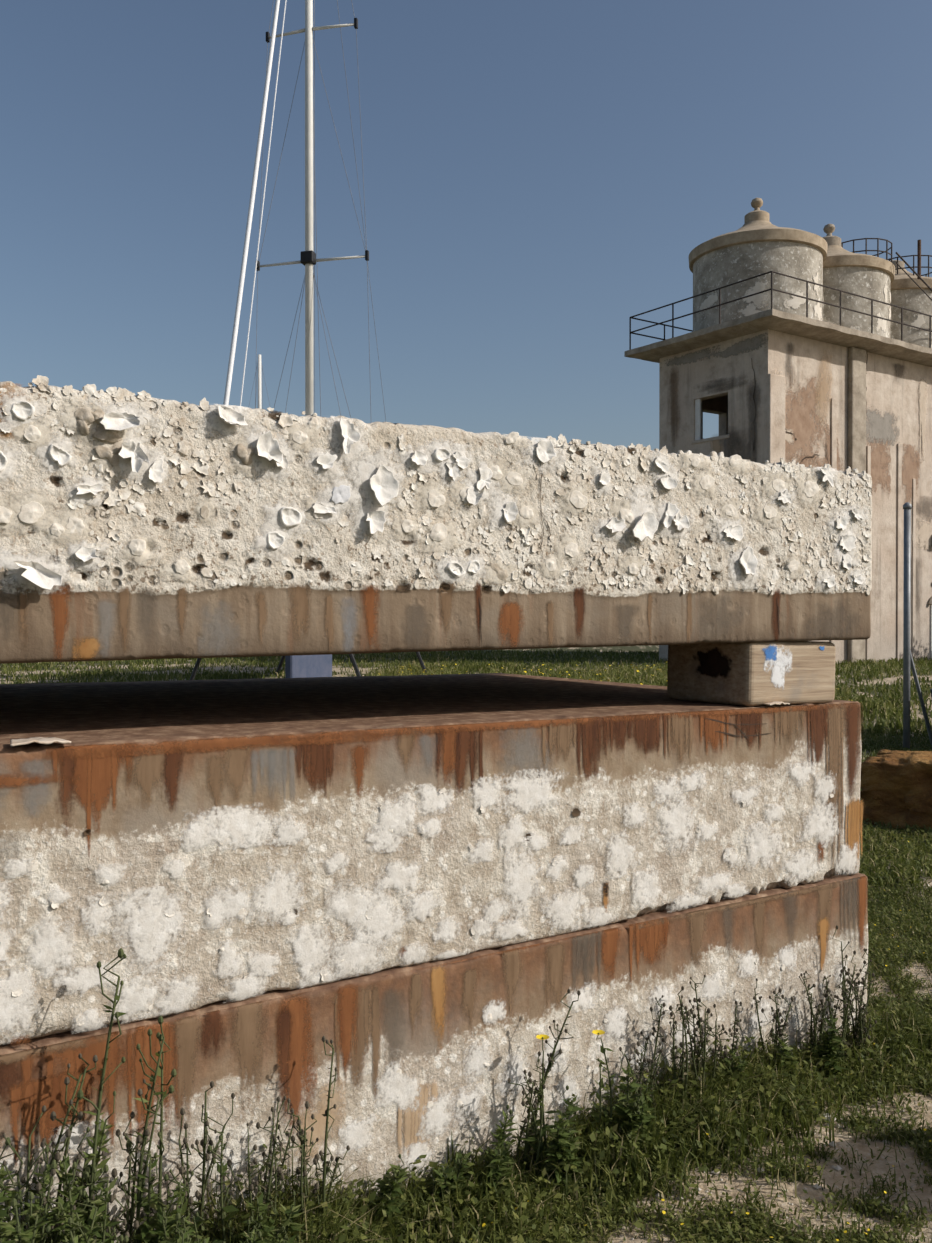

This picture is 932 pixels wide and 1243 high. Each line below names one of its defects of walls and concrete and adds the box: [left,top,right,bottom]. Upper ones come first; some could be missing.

peeling [0,390,200,594]
peeling [176,498,233,539]
peeling [203,377,842,593]
peeling [817,505,869,593]
peeling [867,438,932,551]
corrosion [49,585,103,660]
corrosion [574,587,585,635]
corrosion [772,590,781,641]
corrosion [0,702,867,948]
corrosion [0,1007,233,1163]
corrosion [256,992,317,1125]
corrosion [335,985,380,1098]